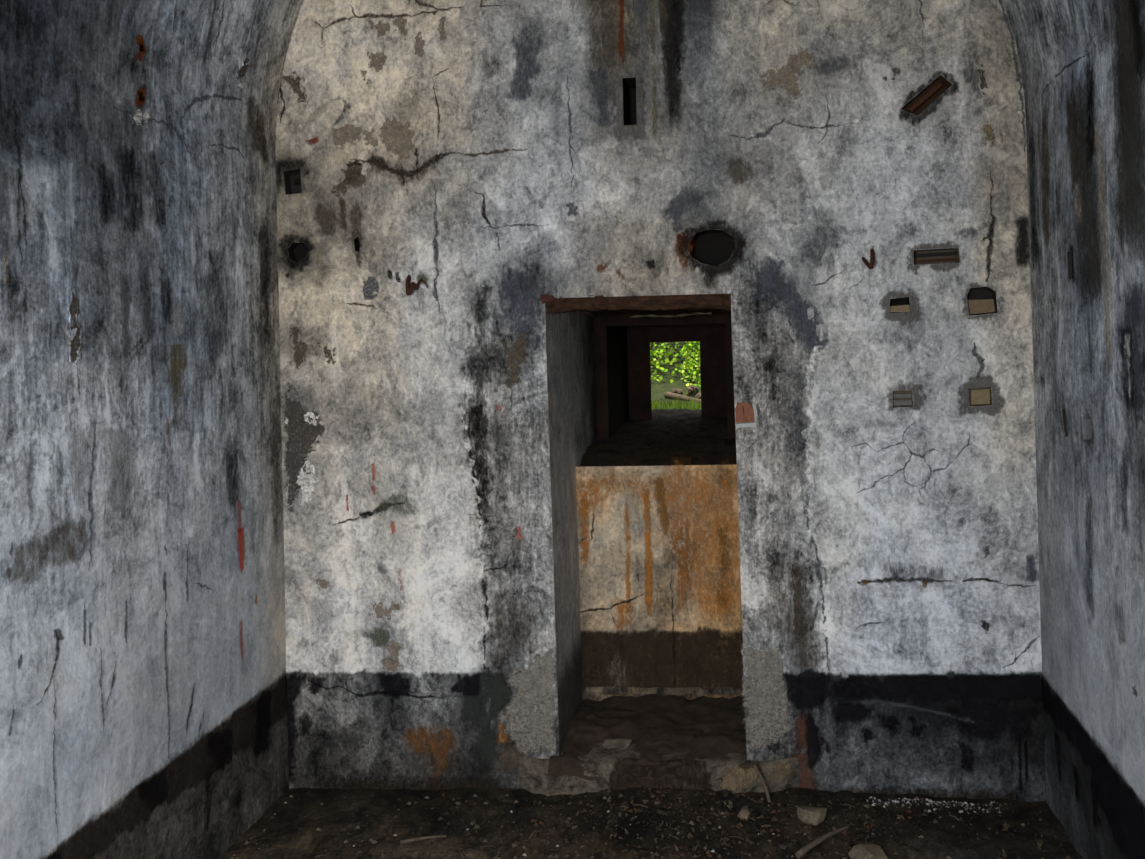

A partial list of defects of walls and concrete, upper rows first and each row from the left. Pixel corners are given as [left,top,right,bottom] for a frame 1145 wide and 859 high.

crack [315,0,502,41]
crack [917,0,925,45]
crack [346,68,527,312]
hole [679,221,744,281]
leakage [462,274,543,509]
crack [851,422,970,499]
spalling [7,523,85,579]
peeling [48,388,490,859]
crack [334,496,414,525]
corrosion [644,468,739,613]
crack [857,568,1034,588]
peeling [780,345,1145,859]